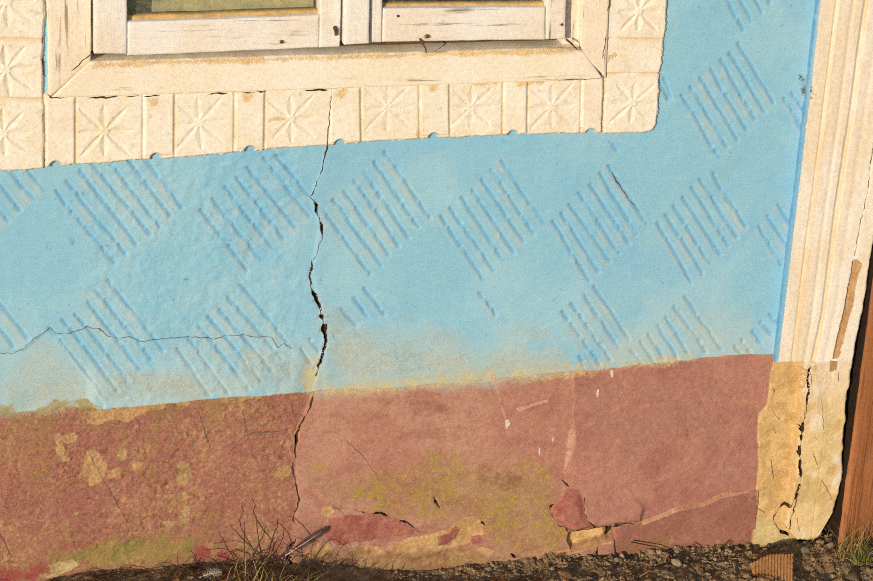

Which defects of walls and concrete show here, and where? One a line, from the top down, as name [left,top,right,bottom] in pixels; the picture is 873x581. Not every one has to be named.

crack [90,93,157,101]
crack [1,326,291,354]
crack [197,89,334,564]
peeling [53,430,146,488]
peeling [560,421,577,476]
spalling [616,363,809,527]
crack [757,366,834,542]
peeling [158,458,195,533]
peeling [305,505,521,571]
spalling [538,527,615,560]